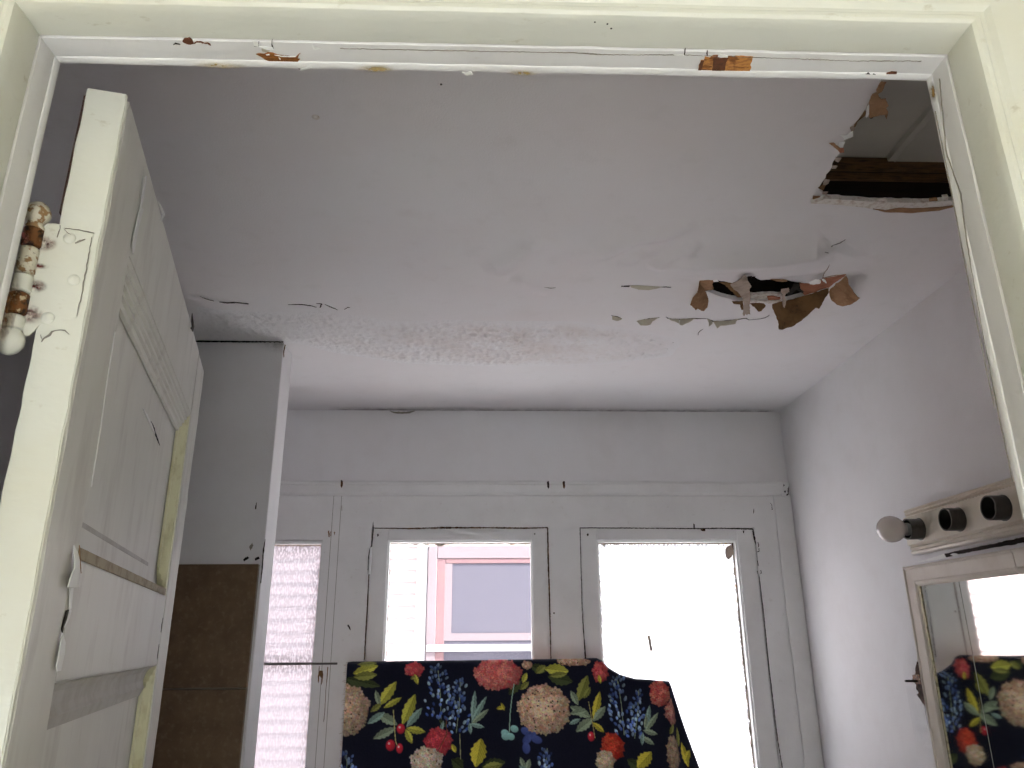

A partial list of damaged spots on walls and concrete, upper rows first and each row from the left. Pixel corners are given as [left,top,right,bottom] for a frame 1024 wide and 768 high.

peeling [173,37,211,46]
peeling [253,40,312,71]
peeling [698,50,753,71]
rust [2,294,11,324]
peeling [637,291,782,328]
peeling [56,545,82,671]